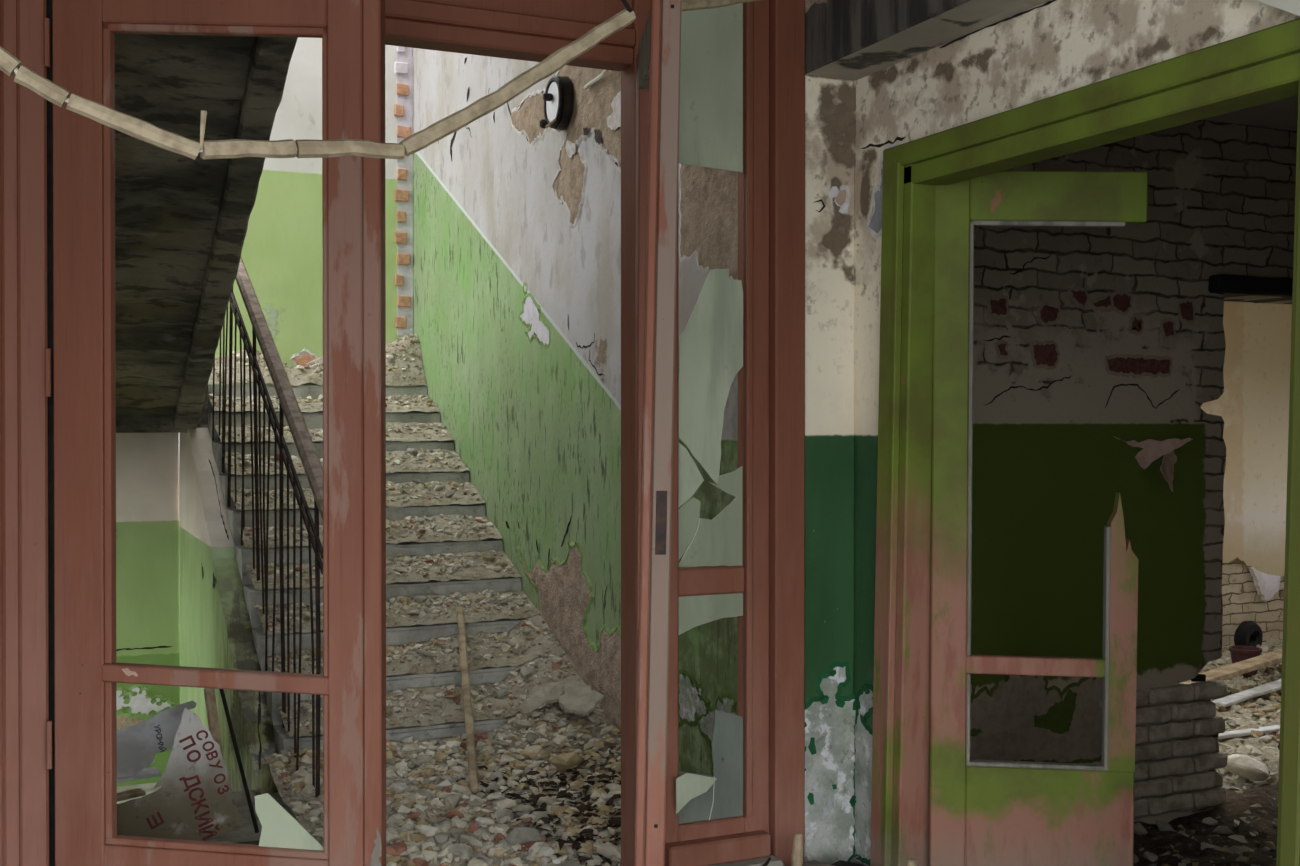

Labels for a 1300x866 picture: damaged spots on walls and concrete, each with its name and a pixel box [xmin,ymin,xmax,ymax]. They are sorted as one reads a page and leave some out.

damp [933,49,995,81]
spalling [493,65,621,228]
spalling [679,163,738,280]
damp [819,47,931,281]
crack [984,376,1071,406]
crack [1105,384,1179,408]
peeling [515,541,621,732]
peeling [1249,567,1284,602]
peeling [805,661,873,866]